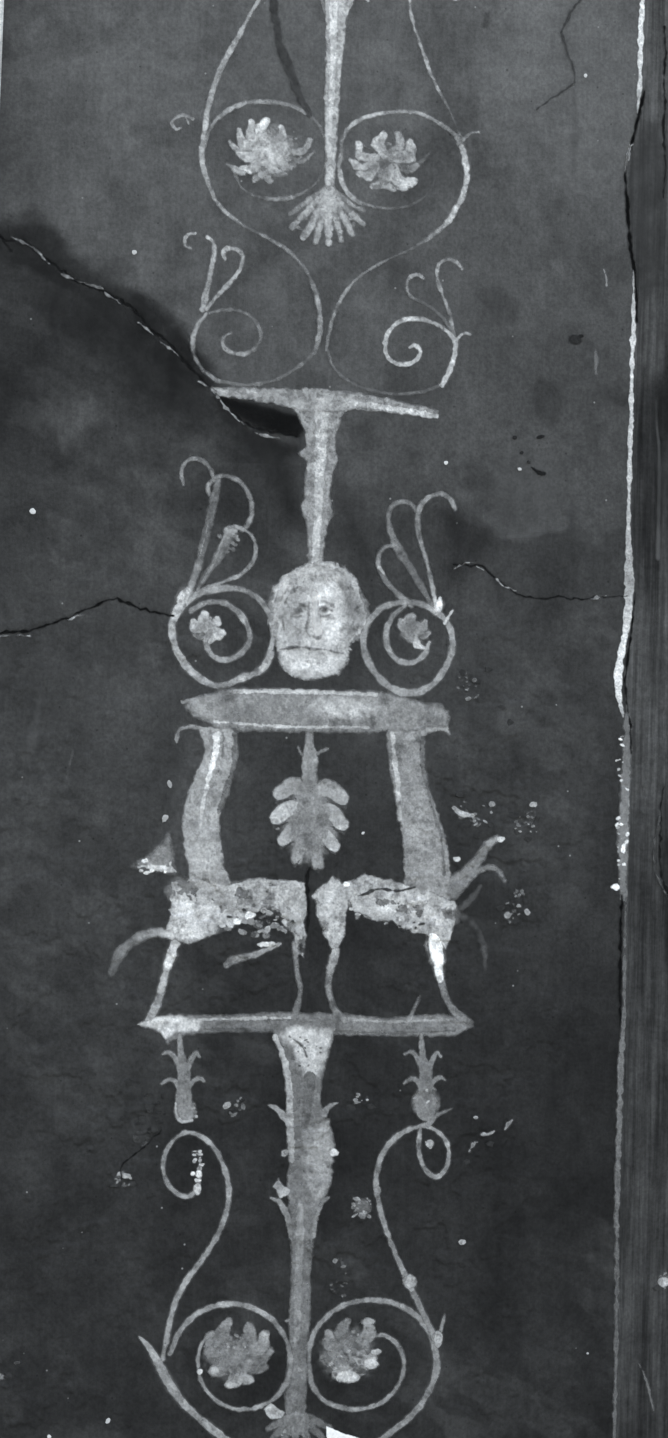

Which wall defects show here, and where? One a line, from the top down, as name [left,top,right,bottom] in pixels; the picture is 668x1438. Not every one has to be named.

crack [270,0,312,117]
crack [537,0,581,110]
crack [0,235,297,439]
crack [0,597,174,637]
crack [453,562,635,754]